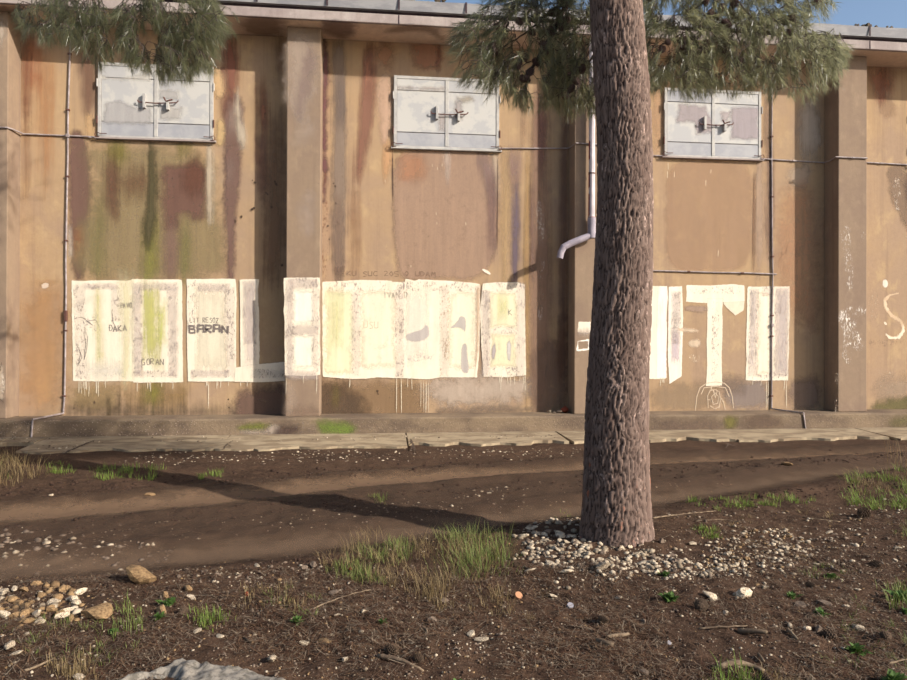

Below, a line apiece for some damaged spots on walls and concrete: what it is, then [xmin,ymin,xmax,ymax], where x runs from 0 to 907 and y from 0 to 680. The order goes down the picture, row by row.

leakage [69,49,245,279]
corrosion [221,34,238,98]
corrosion [357,47,375,176]
leakage [888,165,907,226]